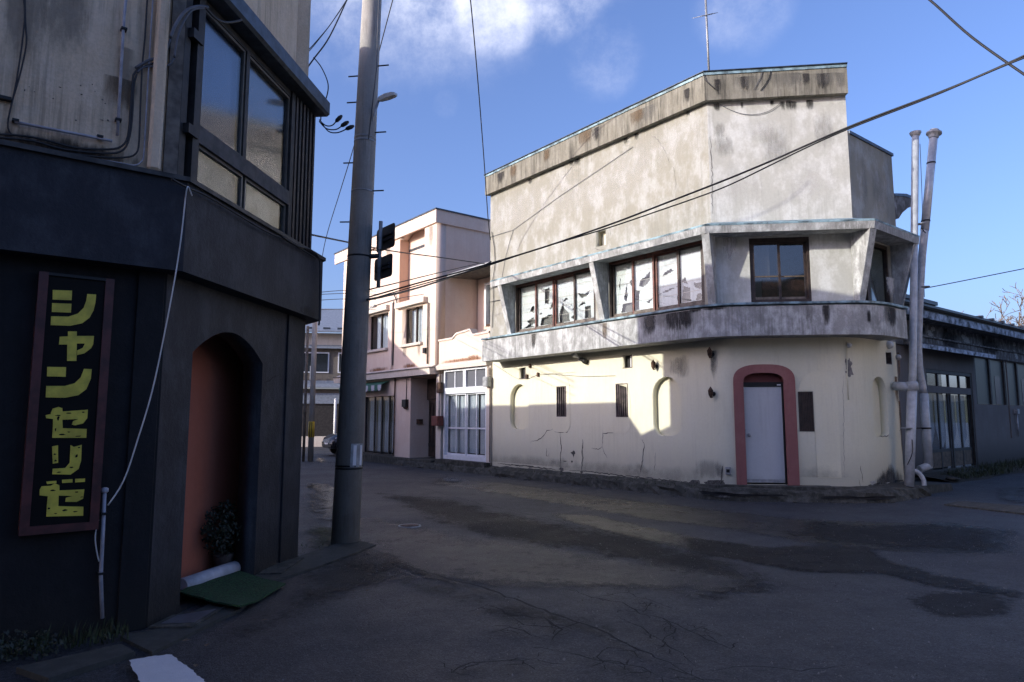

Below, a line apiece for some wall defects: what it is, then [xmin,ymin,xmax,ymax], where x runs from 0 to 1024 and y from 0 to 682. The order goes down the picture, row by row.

water stain [803,73,829,87]
water stain [770,100,813,108]
water stain [644,307,723,333]
water stain [867,306,896,324]
crack [500,430,689,483]